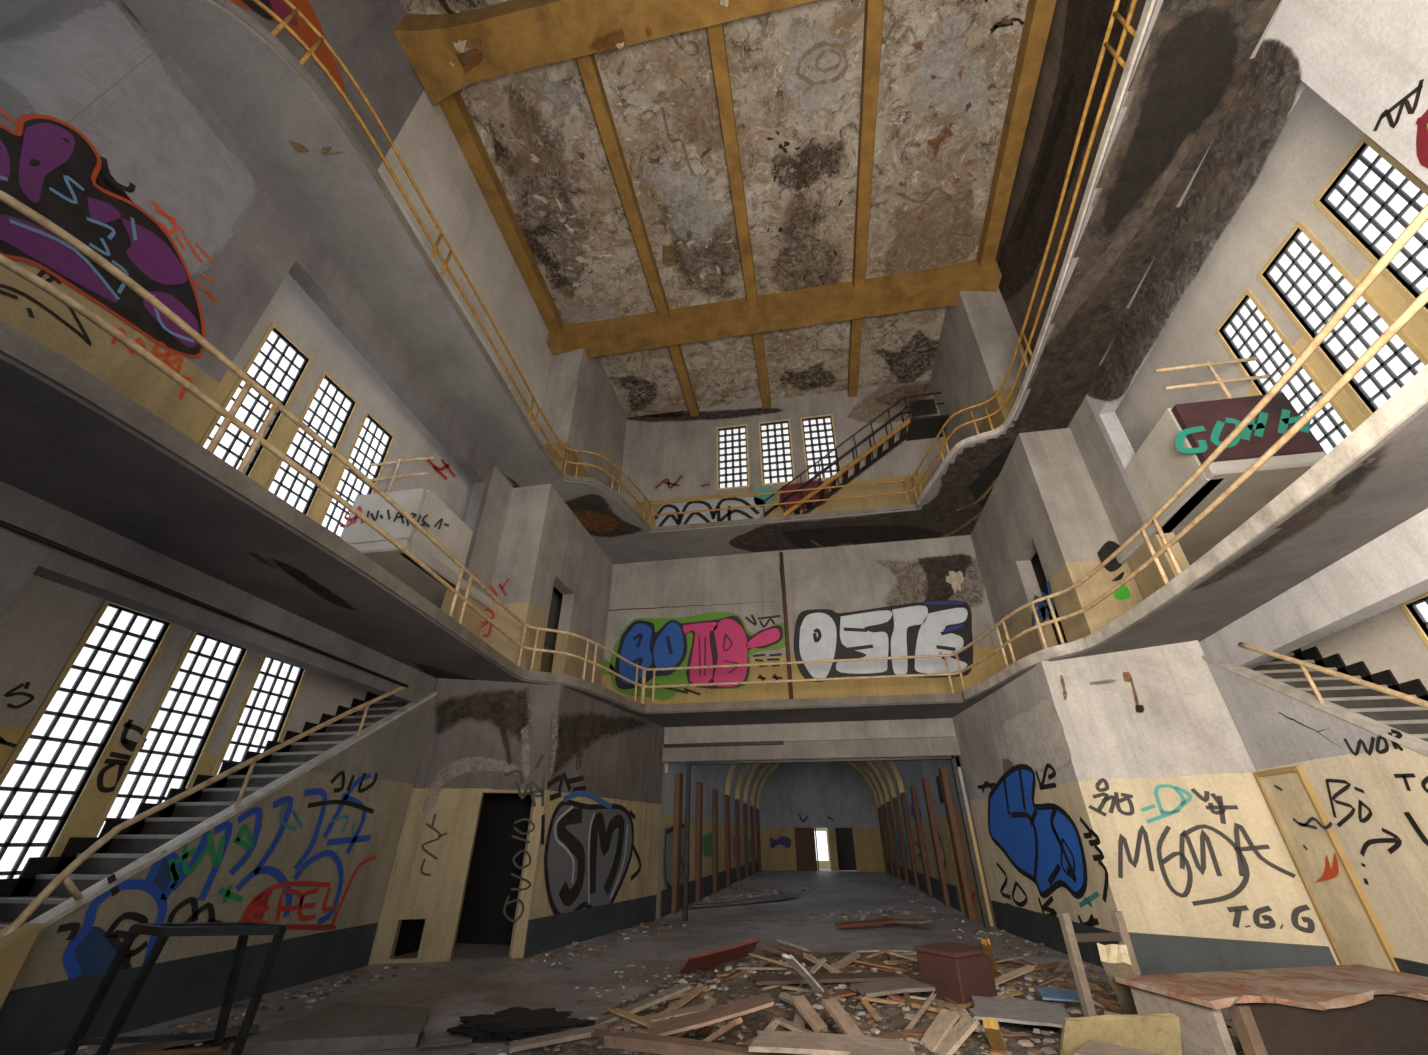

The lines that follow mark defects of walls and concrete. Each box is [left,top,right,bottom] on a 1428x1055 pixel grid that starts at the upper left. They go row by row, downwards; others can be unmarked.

damp [998,0,1128,300]
damp [1047,0,1300,428]
damp [611,376,783,422]
damp [780,363,835,390]
damp [849,331,939,422]